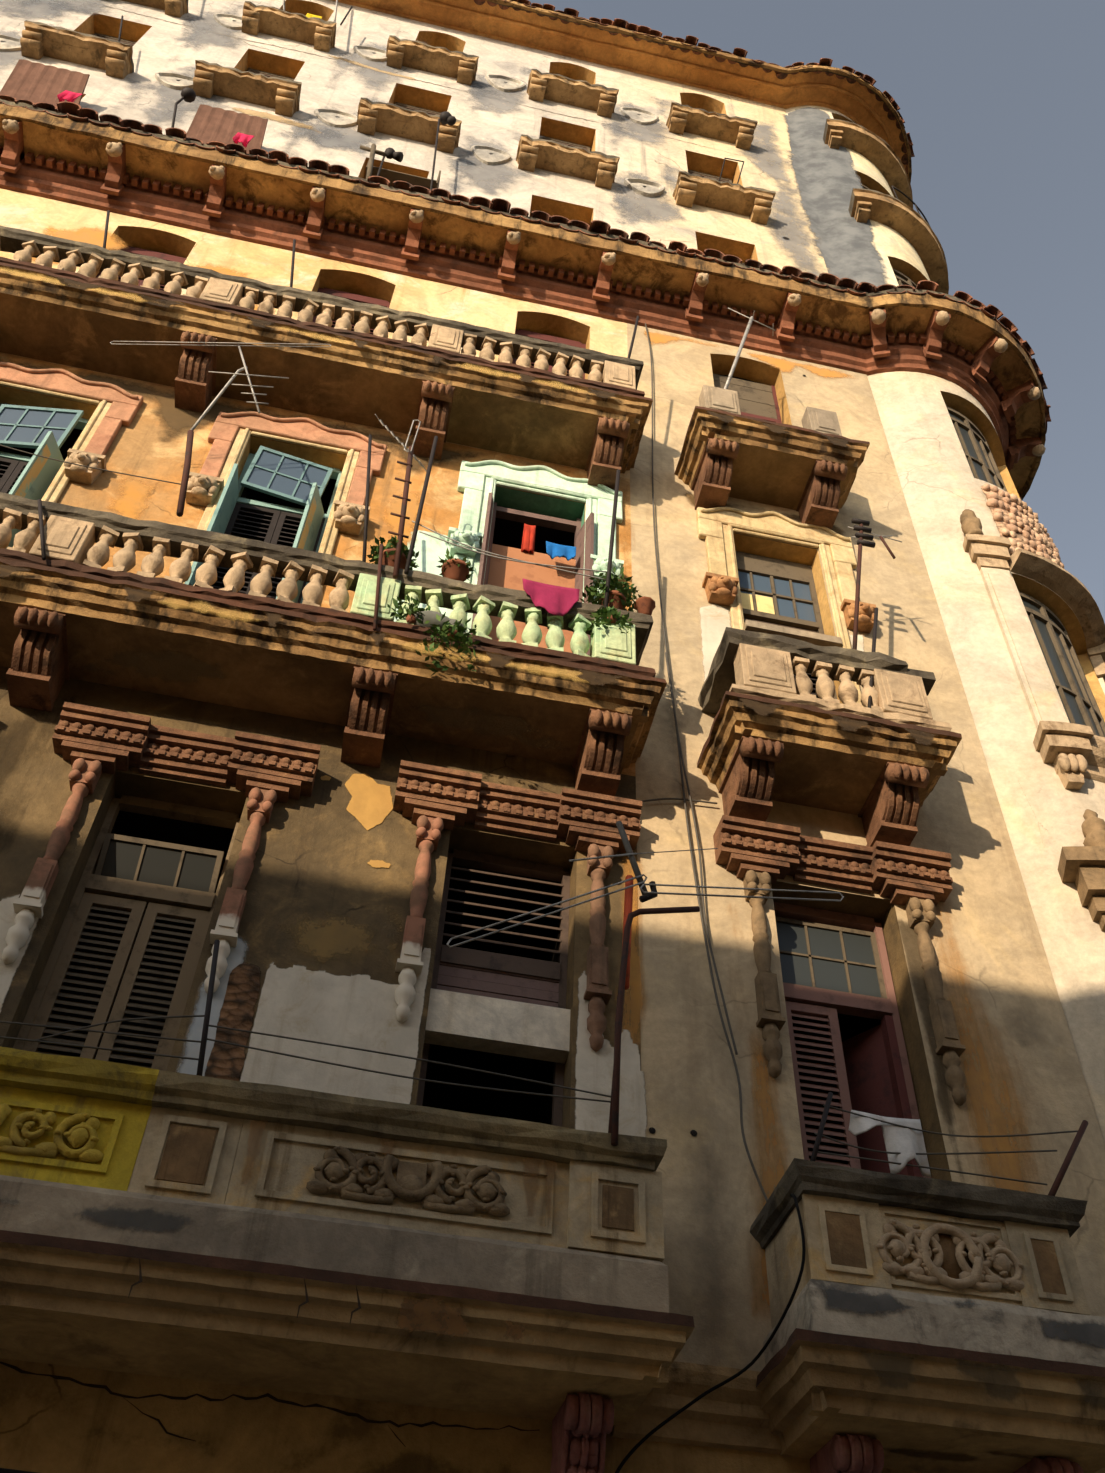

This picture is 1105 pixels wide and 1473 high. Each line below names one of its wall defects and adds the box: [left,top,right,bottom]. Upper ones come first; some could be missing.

water stain [744,107,887,287]
peeling [321,774,393,830]
peeling [367,860,391,868]
peeling [0,894,39,1012]
peeling [179,938,431,1104]
peeling [575,971,647,1137]
water stain [81,1208,189,1232]
water stain [823,1285,909,1315]
water stain [1039,1317,1105,1348]
crack [0,1362,540,1447]